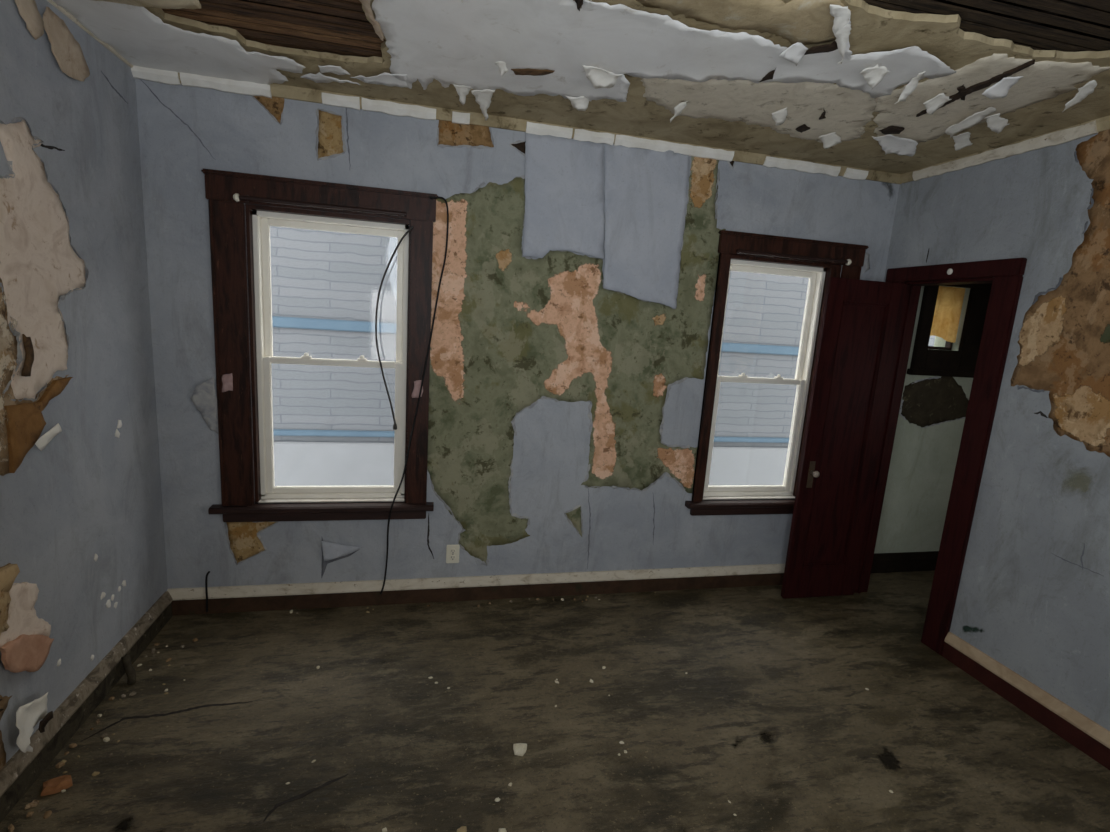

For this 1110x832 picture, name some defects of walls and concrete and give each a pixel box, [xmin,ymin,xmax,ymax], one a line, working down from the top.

peeling [14,0,1110,156]
crack [916,59,1035,117]
flaking render [689,157,717,208]
peeling [0,117,89,476]
flaking render [430,199,468,404]
flaking render [695,274,706,301]
spalling [1011,129,1110,457]
flaking render [514,263,617,479]
flaking render [653,374,667,398]
flaking render [657,448,695,488]
peeling [0,563,61,673]
spalling [0,695,13,771]